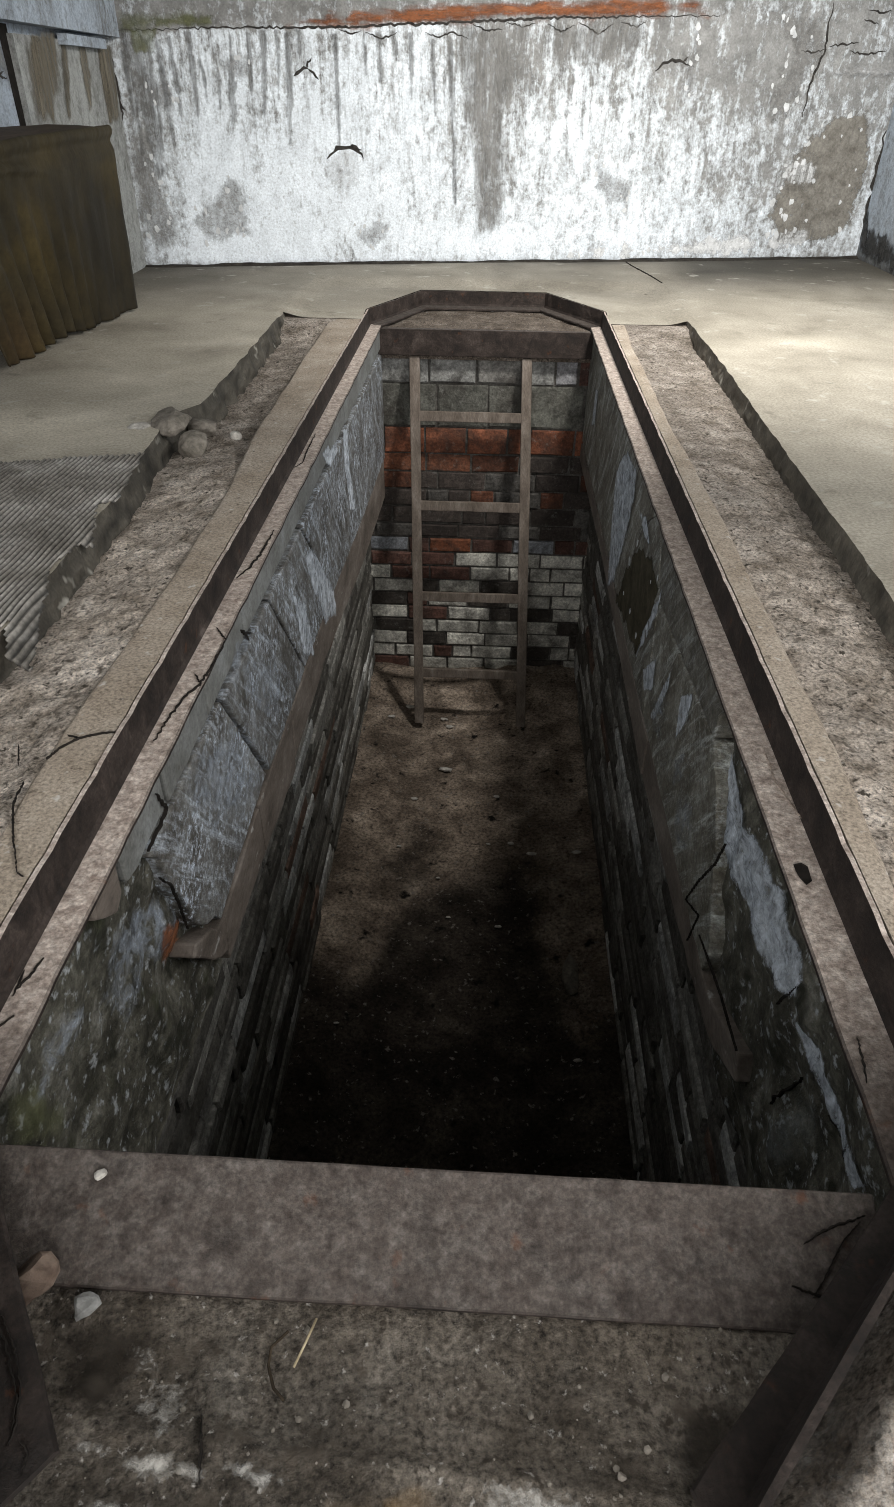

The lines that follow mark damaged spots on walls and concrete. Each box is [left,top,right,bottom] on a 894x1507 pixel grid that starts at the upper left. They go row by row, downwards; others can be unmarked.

leakage [219,30,301,103]
crack [112,14,718,121]
corrosion [309,0,699,26]
crack [802,3,891,117]
crack [327,144,364,159]
leakage [365,25,532,232]
crack [153,627,251,741]
crack [11,731,117,877]
spalling [0,358,890,1211]
crack [685,843,738,1051]